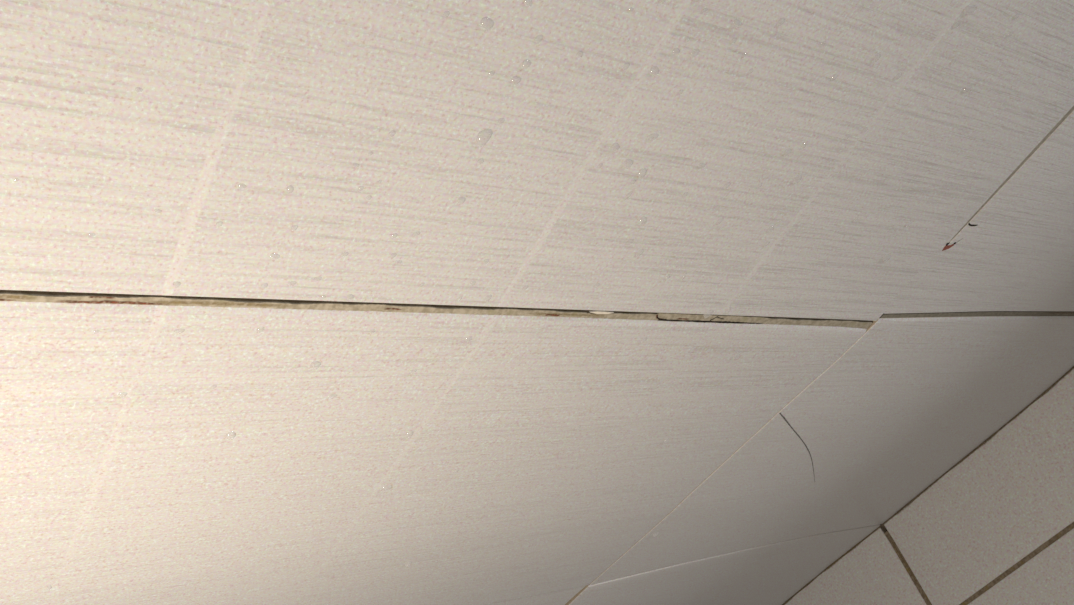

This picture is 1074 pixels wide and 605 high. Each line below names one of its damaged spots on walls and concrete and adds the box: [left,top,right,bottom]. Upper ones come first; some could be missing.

crack [779,413,815,481]